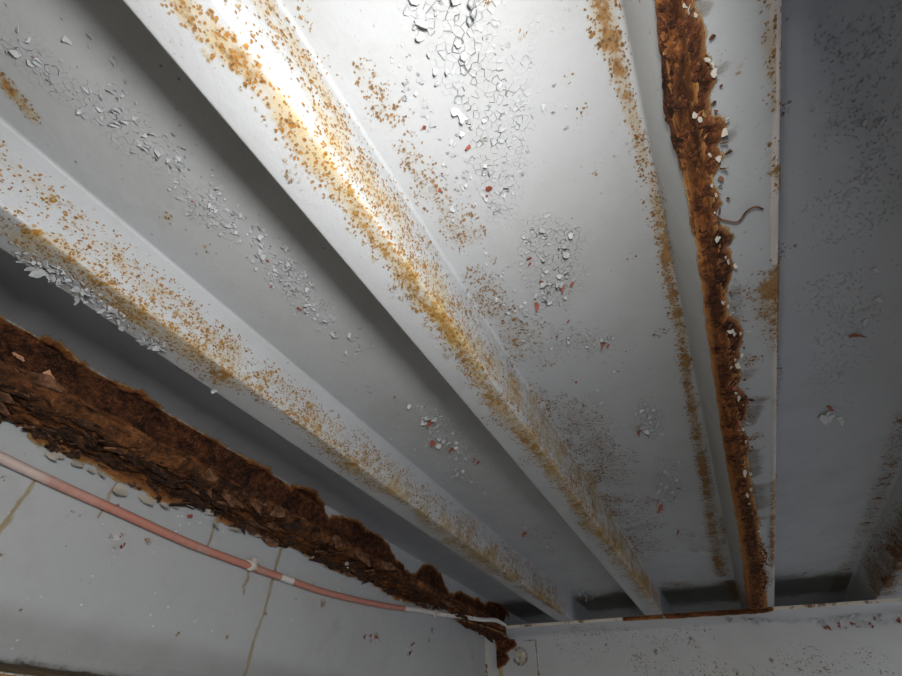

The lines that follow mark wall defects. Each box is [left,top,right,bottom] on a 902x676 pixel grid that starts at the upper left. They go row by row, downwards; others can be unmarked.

corrosion [0,72,42,124]
corrosion [0,140,566,676]
corrosion [160,0,796,657]
corrosion [832,412,902,598]